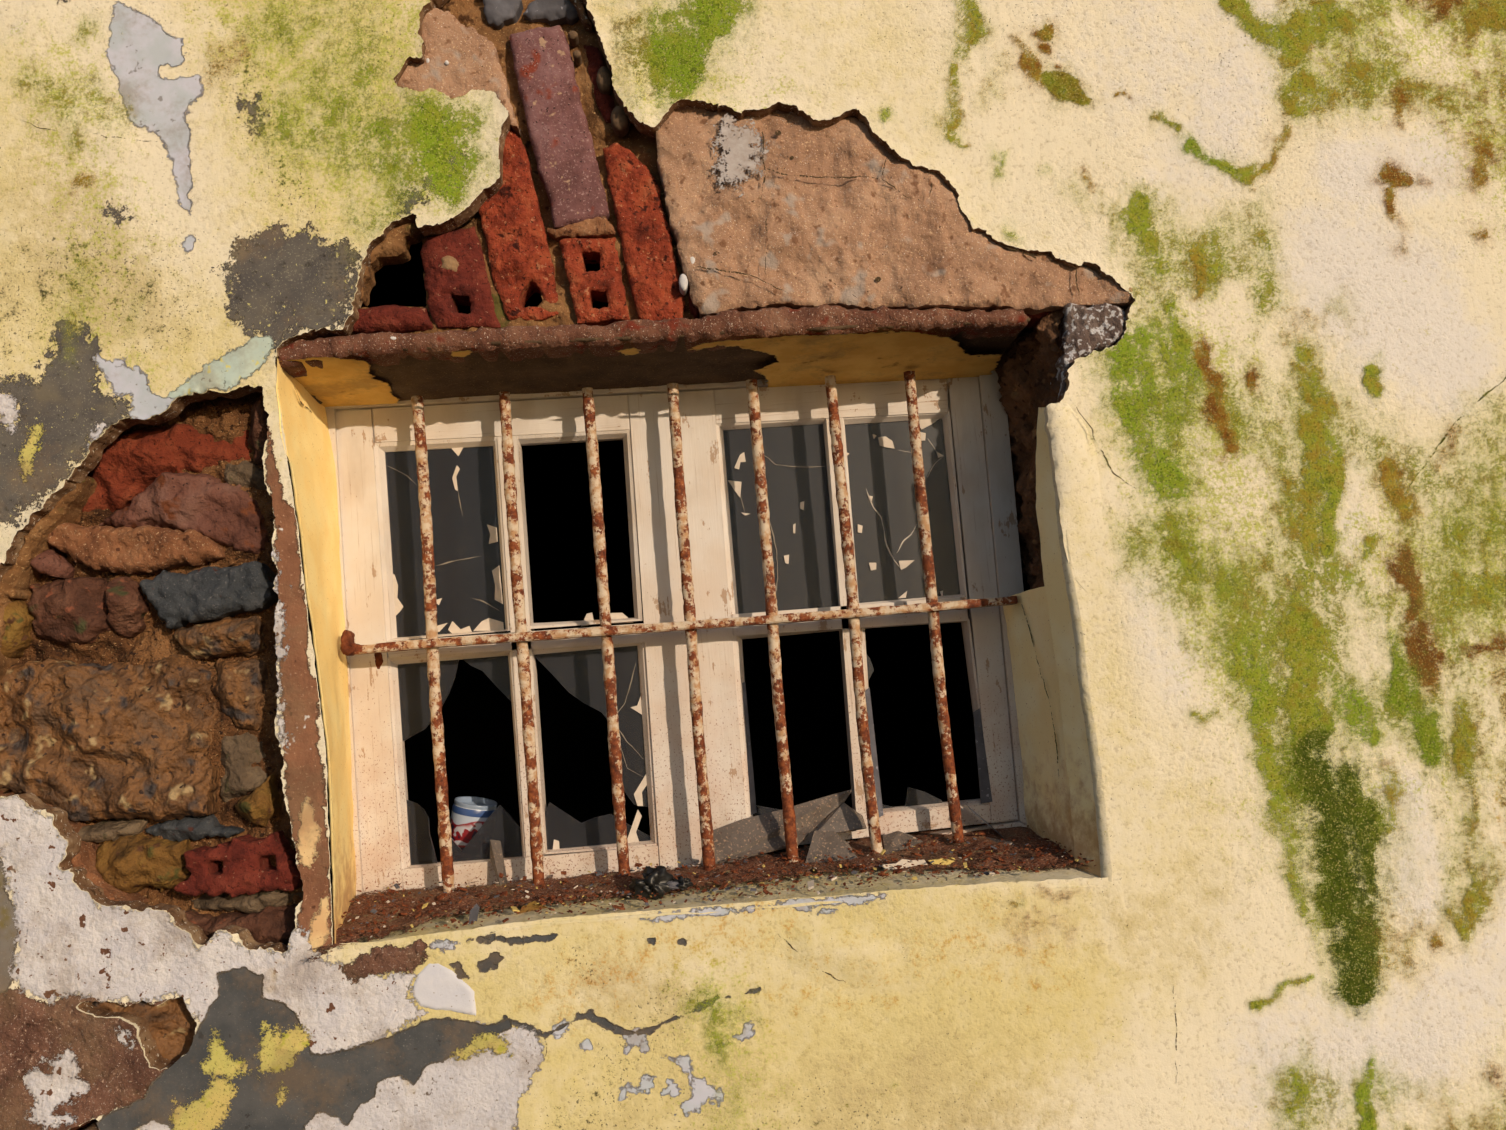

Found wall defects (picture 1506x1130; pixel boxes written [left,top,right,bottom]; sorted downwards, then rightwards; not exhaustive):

water stain [71,174,94,189]
water stain [1150,111,1258,186]
water stain [1269,307,1349,557]
crack [1404,377,1506,494]
flaking render [0,0,1133,1130]
rust [374,653,383,669]